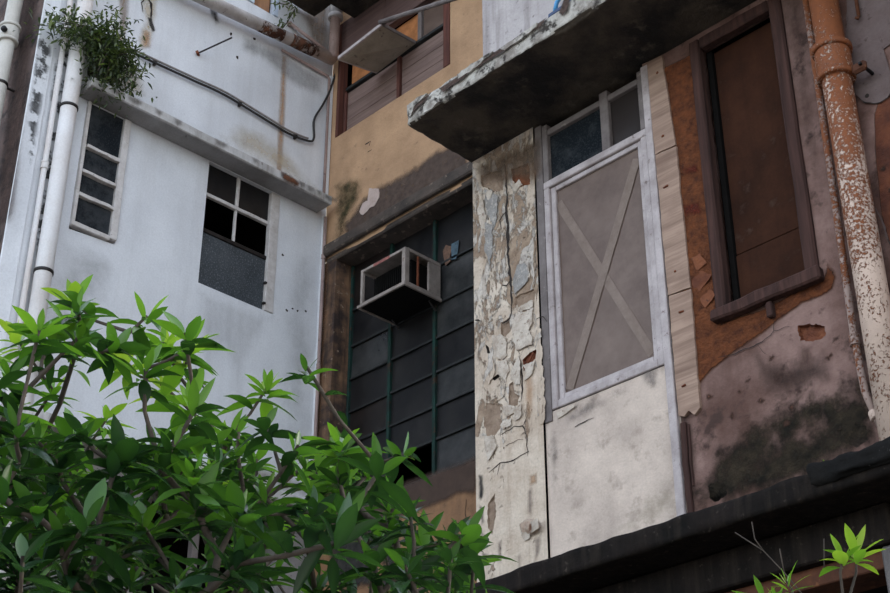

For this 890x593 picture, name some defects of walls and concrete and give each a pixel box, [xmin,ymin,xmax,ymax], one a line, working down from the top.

damp [0,0,69,219]
rust [258,19,317,56]
rust [278,57,299,186]
peeling [407,18,546,117]
flaking render [846,0,890,241]
peeling [359,188,380,215]
damp [346,149,467,232]
peeling [477,174,530,266]
crack [499,180,513,324]
flaking render [665,55,838,382]
damp [769,350,817,385]